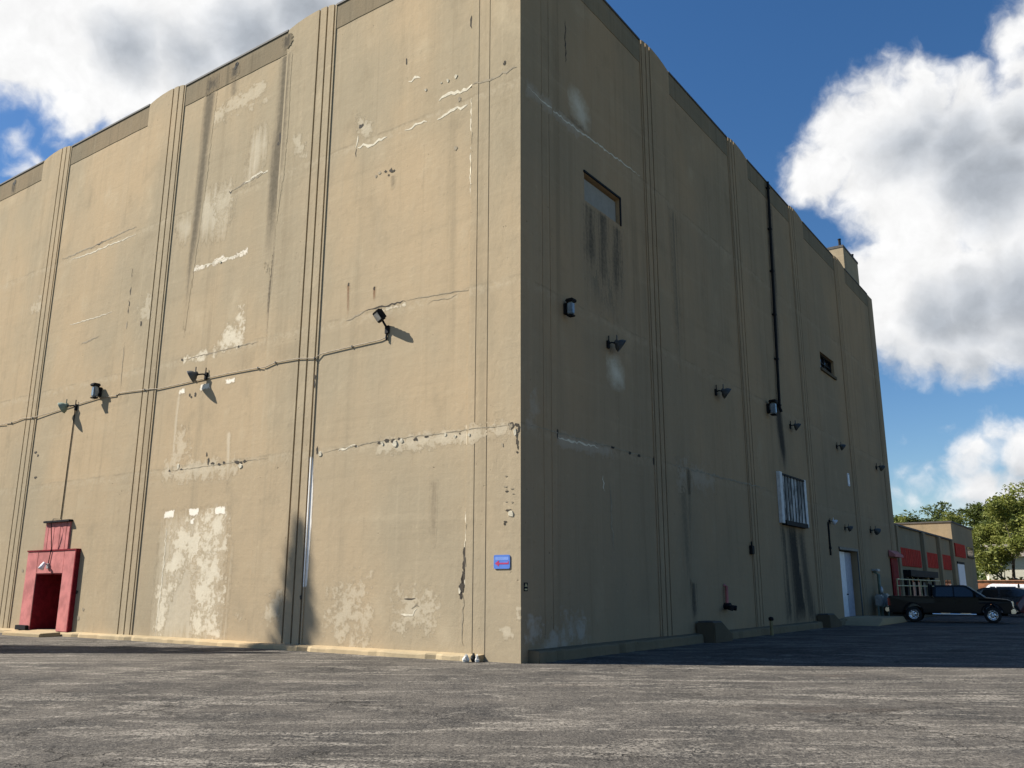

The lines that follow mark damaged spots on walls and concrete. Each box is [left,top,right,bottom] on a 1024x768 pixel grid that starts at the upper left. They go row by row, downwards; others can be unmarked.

peeling [213,79,268,128]
crack [466,104,474,185]
water stain [182,65,240,338]
water stain [264,33,293,345]
crack [63,227,136,259]
water stain [581,200,627,324]
peeling [183,303,246,365]
crack [346,290,467,321]
peeling [149,503,242,640]
peeling [321,566,376,648]
peeling [389,583,441,638]
crack [458,513,466,644]